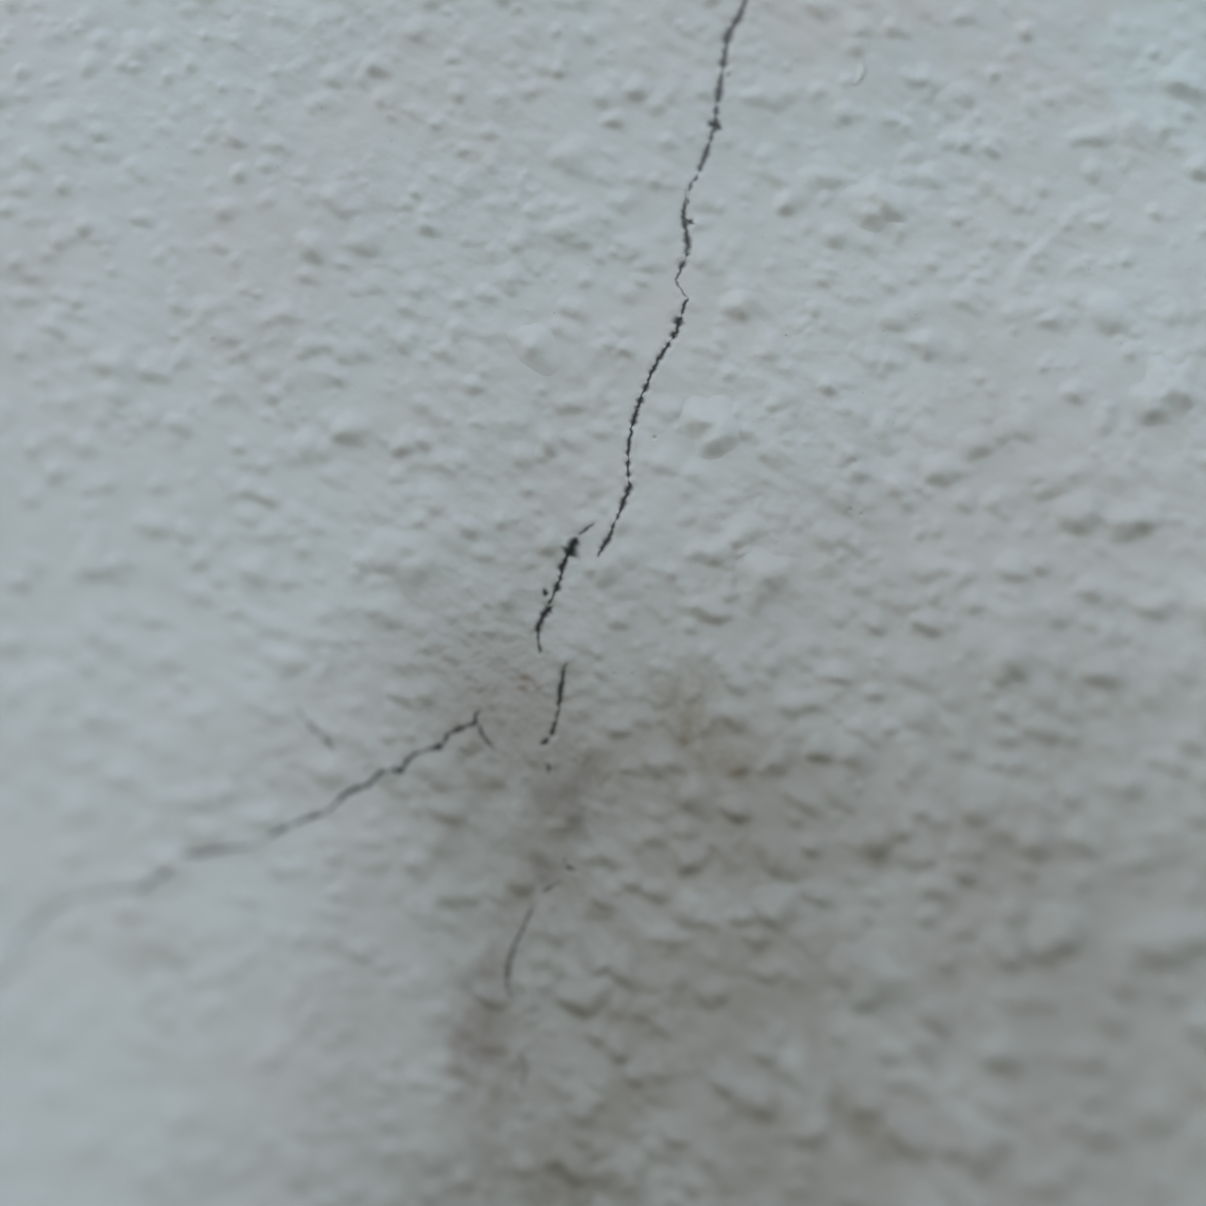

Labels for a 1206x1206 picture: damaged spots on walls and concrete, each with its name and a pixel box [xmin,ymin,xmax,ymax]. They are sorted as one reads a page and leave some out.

crack [536,0,746,770]
crack [0,712,496,978]
crack [506,867,574,995]